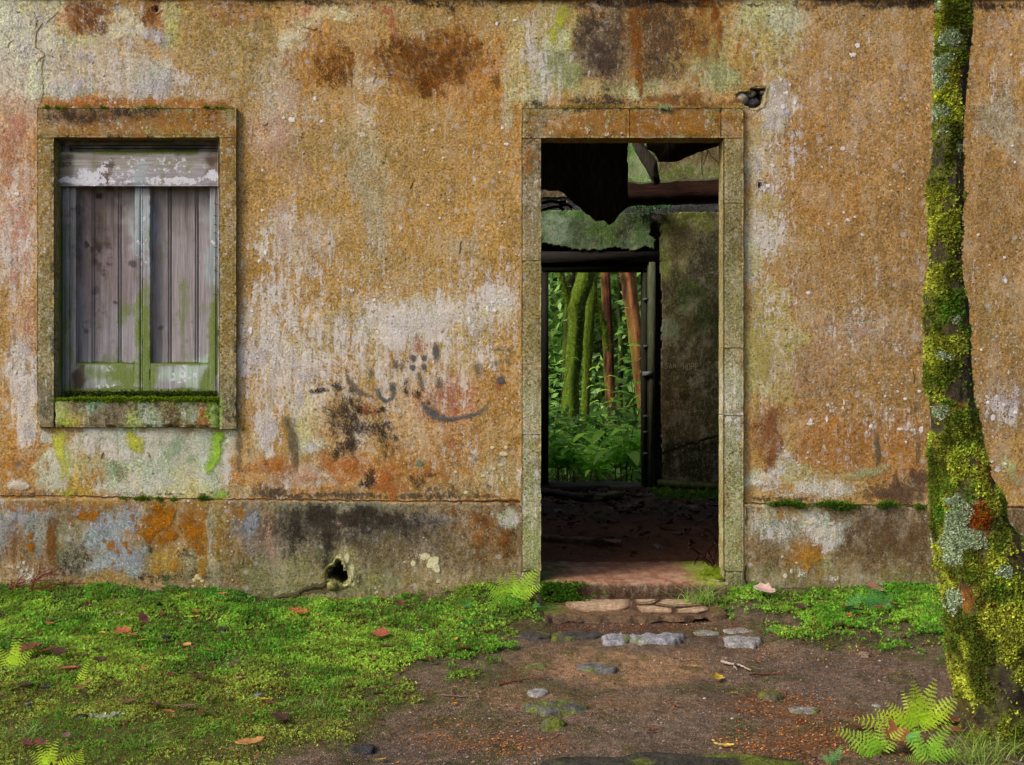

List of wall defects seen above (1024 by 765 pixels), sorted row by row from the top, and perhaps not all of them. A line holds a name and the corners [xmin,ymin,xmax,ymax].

water stain [289,0,373,17]
water stain [404,0,502,13]
water stain [863,0,935,11]
water stain [972,0,1024,12]
crack [0,12,57,101]
rust [372,2,488,100]
water stain [561,0,717,96]
water stain [241,323,403,485]
spalling [322,550,355,591]
water stain [283,498,517,574]